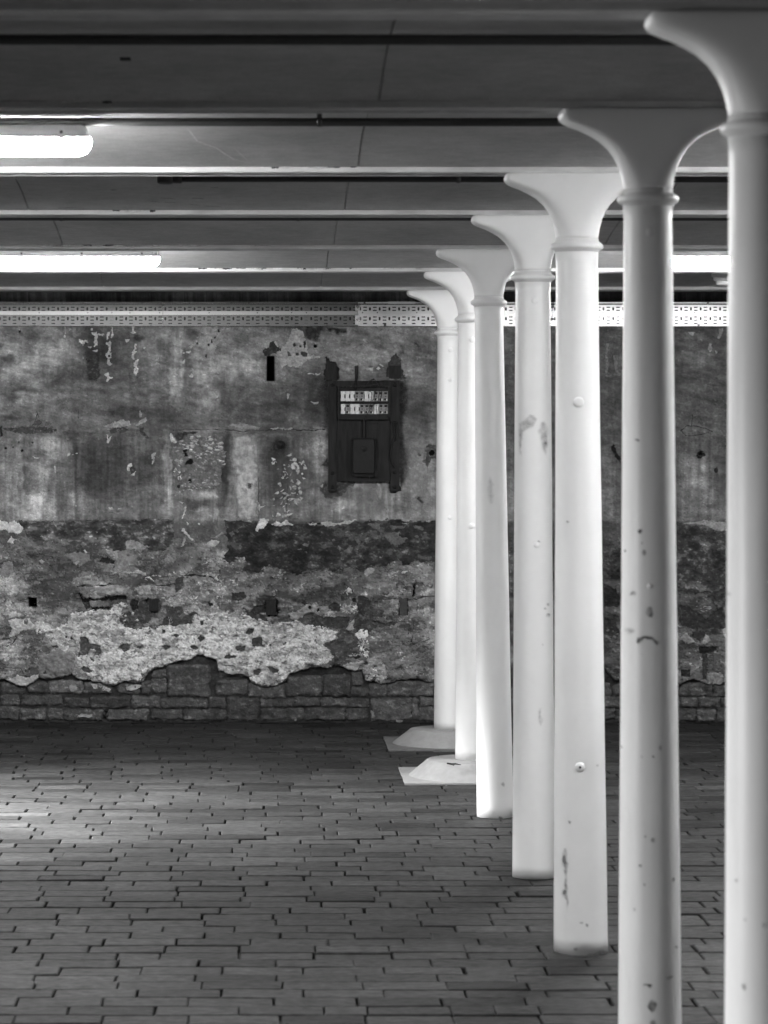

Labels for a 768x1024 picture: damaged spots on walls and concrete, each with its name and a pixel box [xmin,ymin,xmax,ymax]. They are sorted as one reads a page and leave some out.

peeling [63,326,145,382]
peeling [263,328,339,381]
leakage [234,436,257,519]
peeling [0,431,437,723]
spalling [603,584,621,649]
peeling [676,520,727,723]
flaking render [604,669,620,723]